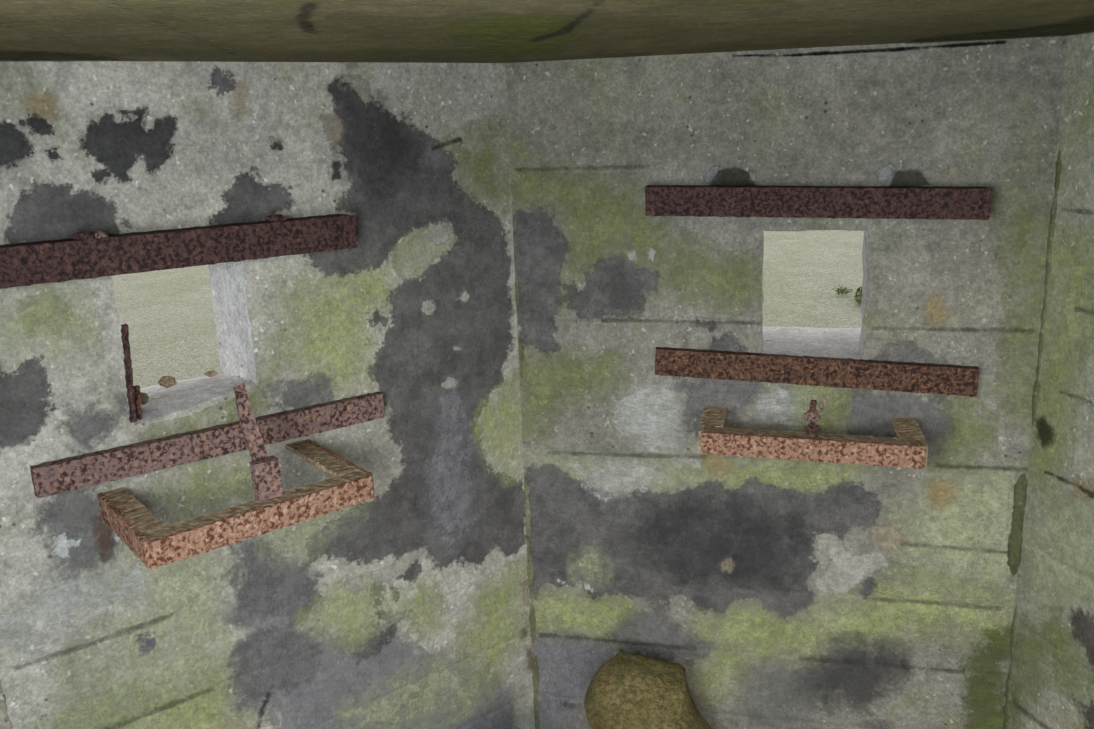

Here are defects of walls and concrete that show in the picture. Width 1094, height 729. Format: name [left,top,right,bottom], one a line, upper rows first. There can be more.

water stain [0,107,178,244]
water stain [208,166,293,225]
water stain [0,355,57,448]
water stain [61,396,130,450]
water stain [224,79,881,729]
water stain [1071,609,1094,665]
water stain [1079,700,1094,729]